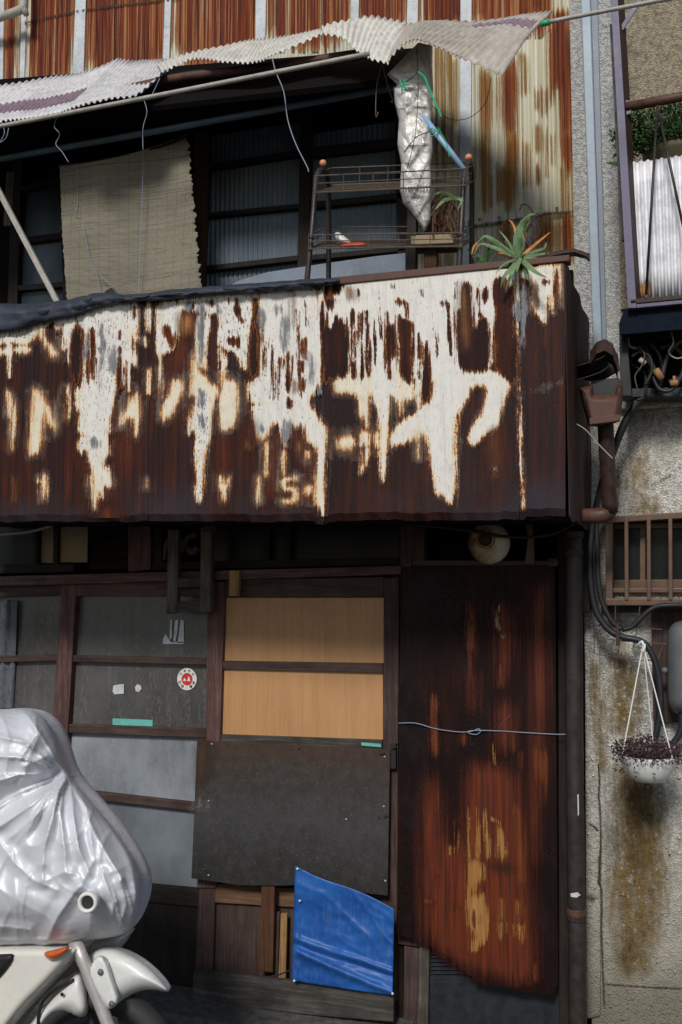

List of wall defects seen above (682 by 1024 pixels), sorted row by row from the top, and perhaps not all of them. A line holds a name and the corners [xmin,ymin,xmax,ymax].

rust [3,0,574,259]
rust [74,435,101,493]
rust [69,322,125,390]
rust [93,487,124,518]
peeling [0,263,564,517]
rust [162,266,560,502]
rust [397,558,559,996]
damp [589,652,642,769]
damp [605,770,666,975]